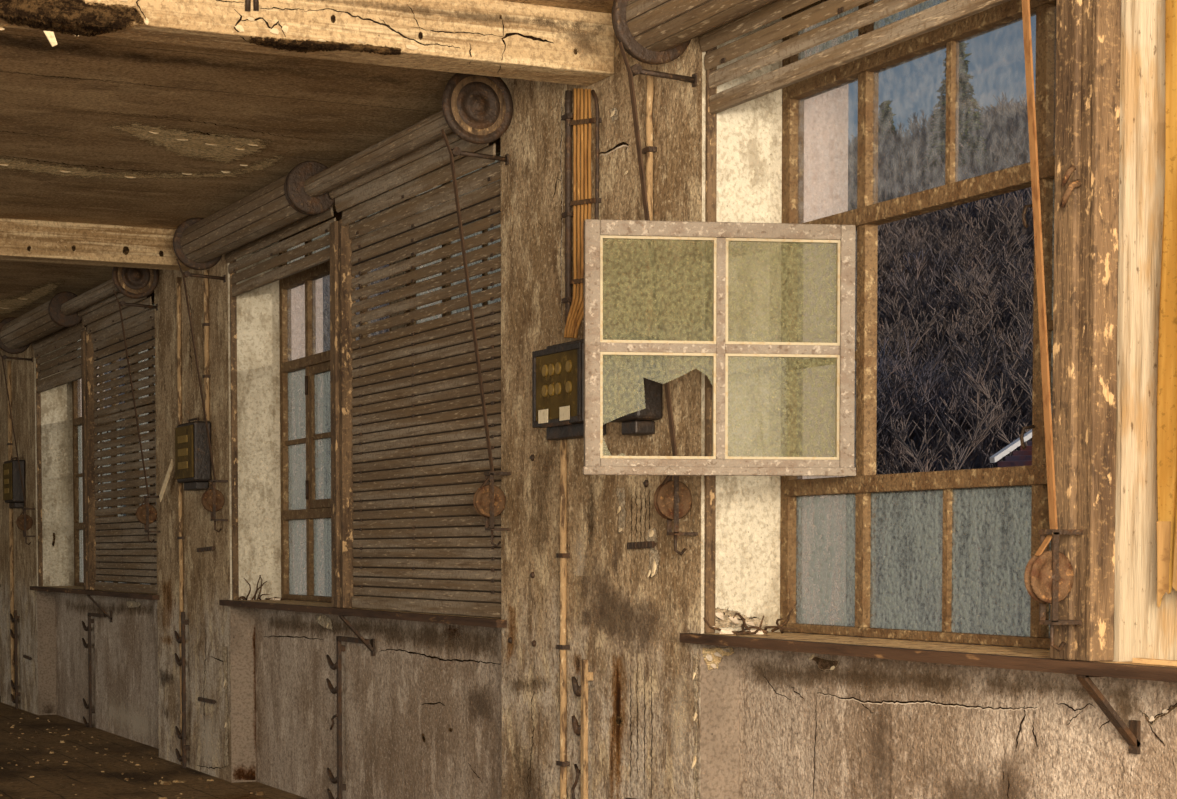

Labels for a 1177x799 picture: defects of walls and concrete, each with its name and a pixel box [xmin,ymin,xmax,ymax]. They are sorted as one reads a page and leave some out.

spalling [0,0,149,47]
spalling [234,9,418,55]
crack [216,0,553,70]
crack [264,634,323,642]
crack [379,649,497,664]
corrosion [610,656,625,799]
crack [763,674,1110,795]